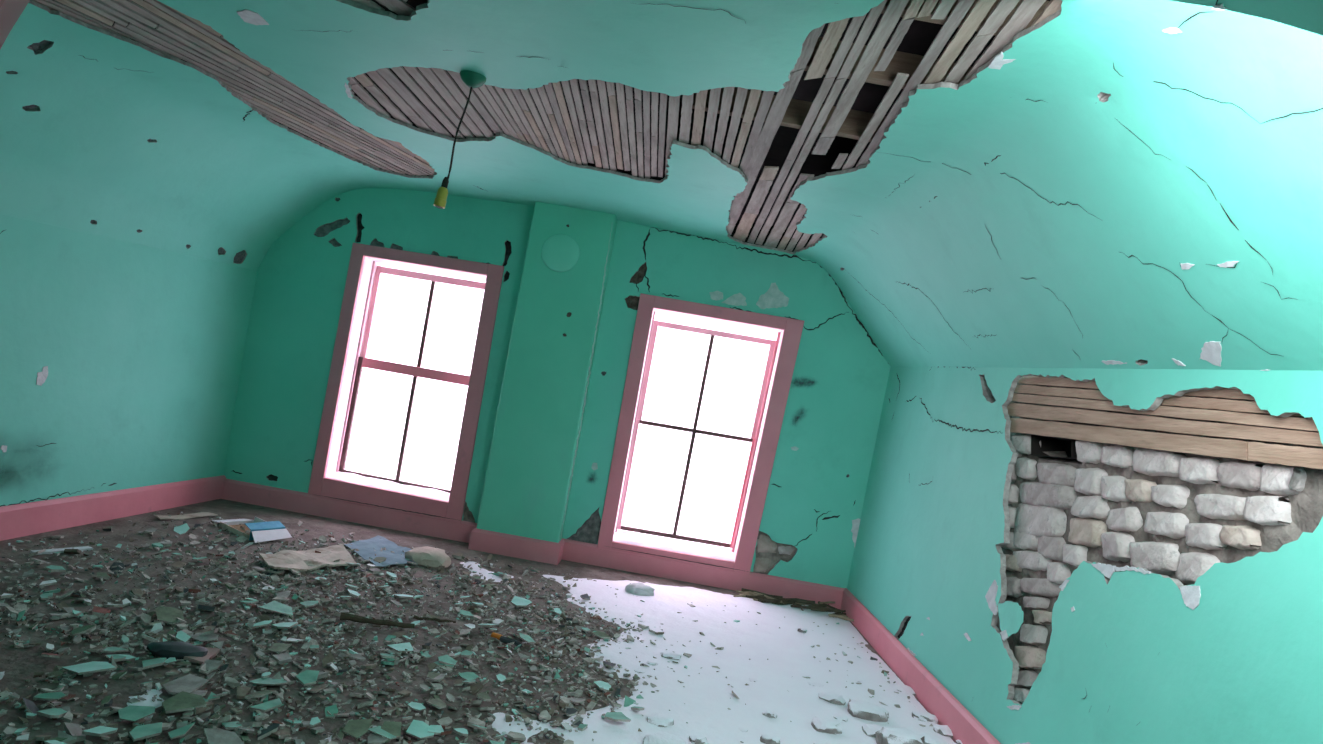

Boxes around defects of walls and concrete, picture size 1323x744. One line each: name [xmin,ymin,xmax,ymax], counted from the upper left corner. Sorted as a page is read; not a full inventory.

crack [1162,0,1228,34]
flaking render [28,40,52,52]
flaking render [988,51,1016,70]
crack [1113,63,1323,124]
crack [885,153,1101,220]
flaking render [315,213,403,250]
crack [1115,118,1298,357]
flaking render [560,222,613,544]
hole [1031,435,1081,460]
flaking render [753,531,797,574]
flaking render [1092,563,1151,579]
flaking render [1180,585,1201,610]